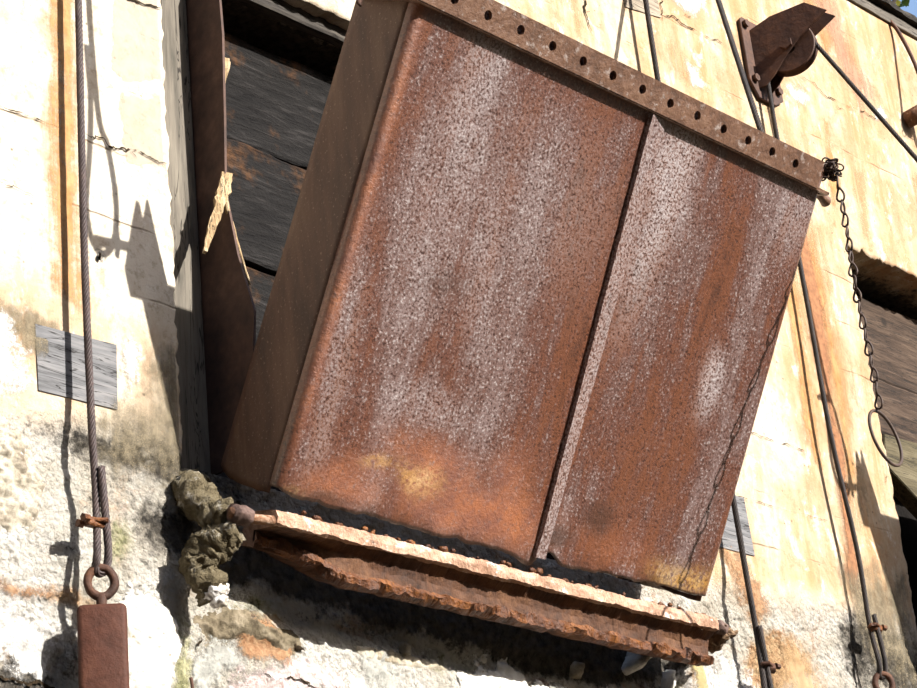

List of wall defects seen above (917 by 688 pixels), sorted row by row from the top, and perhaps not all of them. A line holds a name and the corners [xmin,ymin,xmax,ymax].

corrosion [48,0,90,306]
crack [86,134,165,163]
corrosion [787,284,822,465]
corrosion [801,235,859,592]
peeling [354,645,448,671]
peeling [569,661,585,679]
peeling [621,651,652,676]